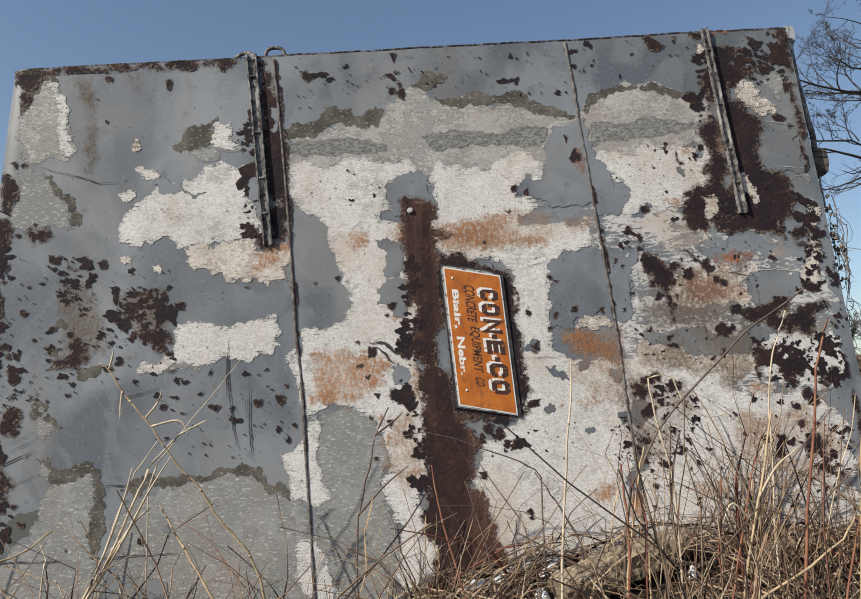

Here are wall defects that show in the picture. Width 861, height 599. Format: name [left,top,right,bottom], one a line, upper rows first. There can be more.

corrosion [641,36,675,52]
peeling [7,79,77,232]
corrosion [244,60,294,270]
corrosion [662,28,822,253]
corrosion [0,343,23,437]
peeling [36,407,56,441]
corrosion [118,290,175,357]
corrosion [299,196,546,598]
peeling [109,80,861,599]
corrosion [563,226,844,478]
corrosion [852,389,861,438]
peeling [0,461,105,599]